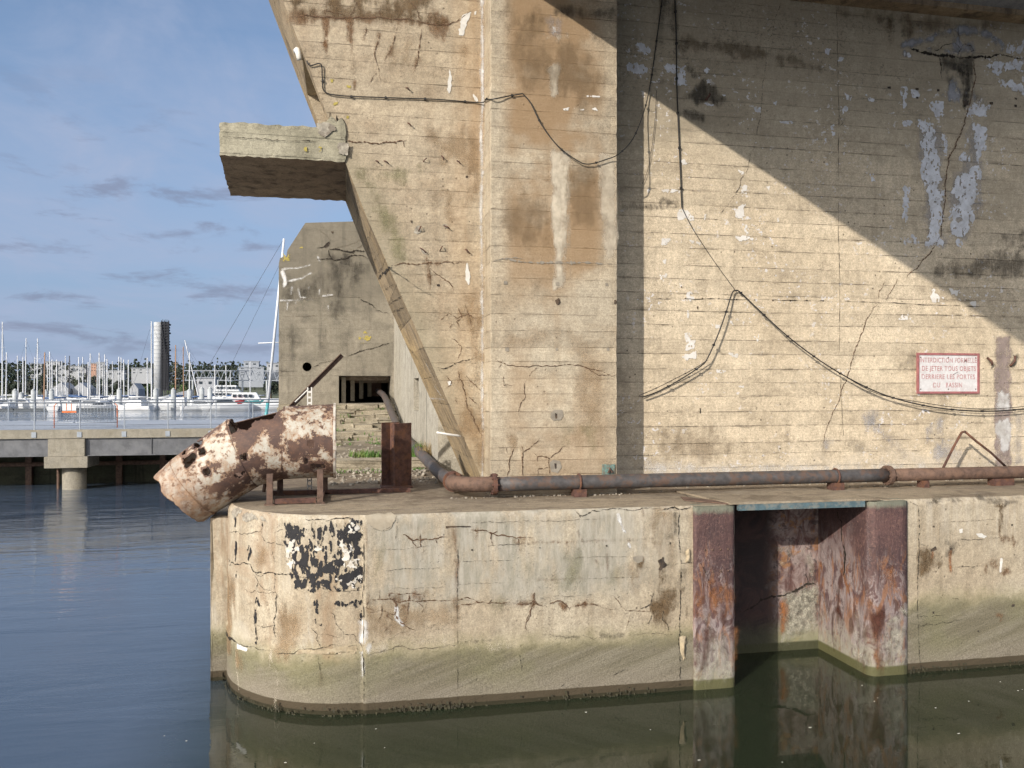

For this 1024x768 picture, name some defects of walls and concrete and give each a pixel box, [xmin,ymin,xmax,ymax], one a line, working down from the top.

rust [868,601,885,663]